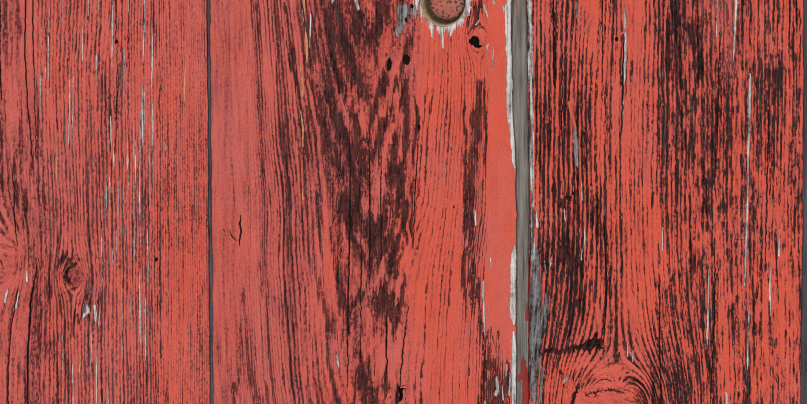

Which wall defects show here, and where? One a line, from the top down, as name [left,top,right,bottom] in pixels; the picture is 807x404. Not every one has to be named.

peeling [300,0,311,97]
peeling [395,0,516,169]
peeling [494,0,552,404]